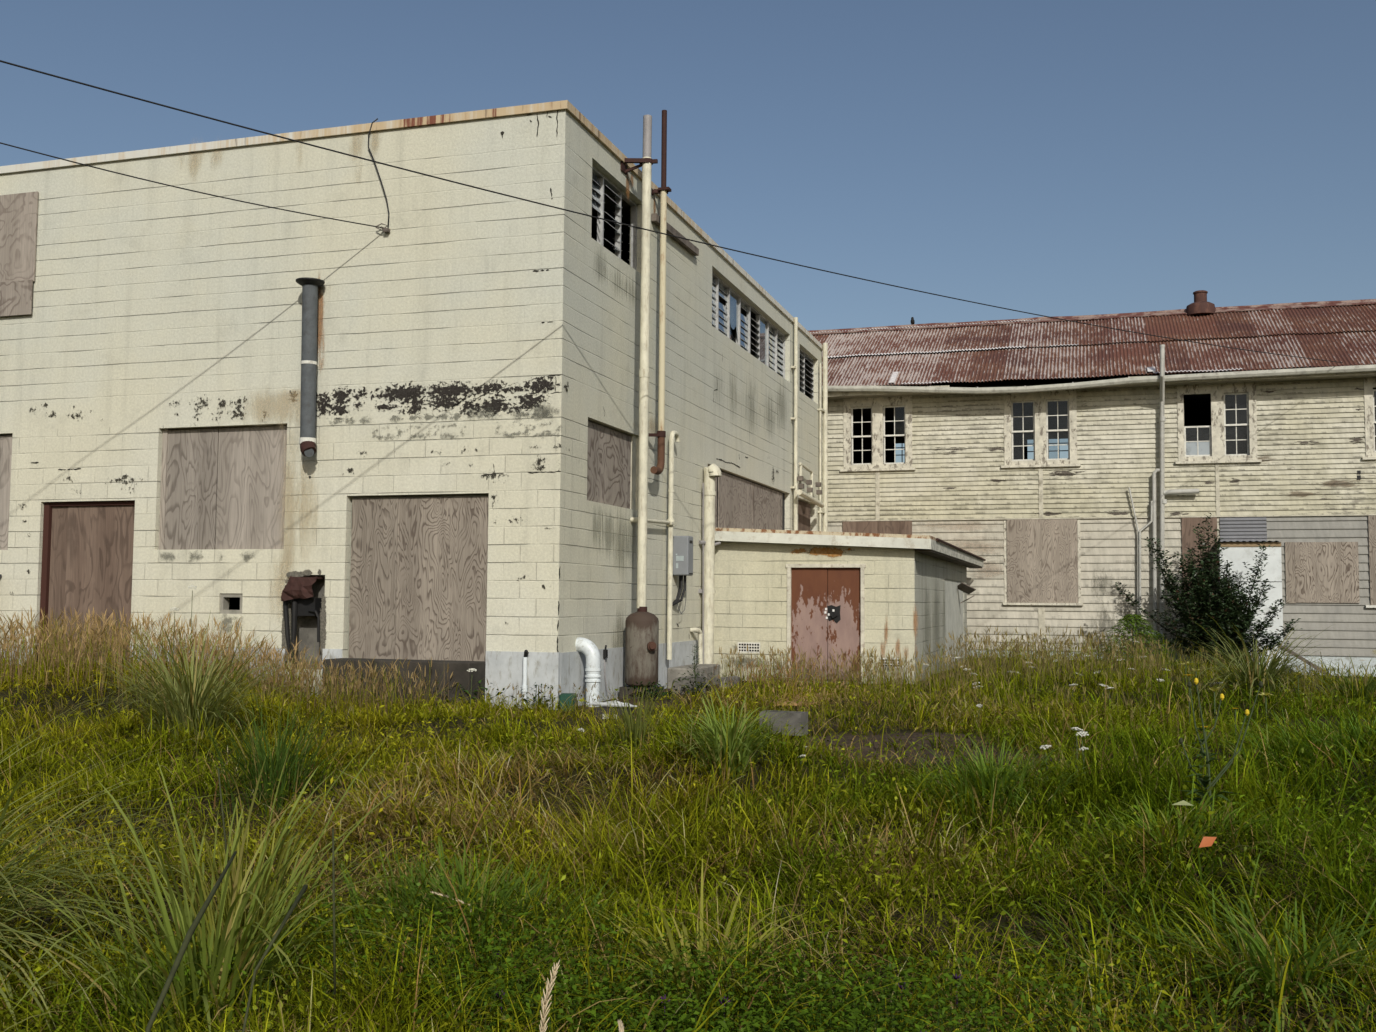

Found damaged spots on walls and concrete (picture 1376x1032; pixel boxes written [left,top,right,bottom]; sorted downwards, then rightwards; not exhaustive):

peeling [316,376,560,420]